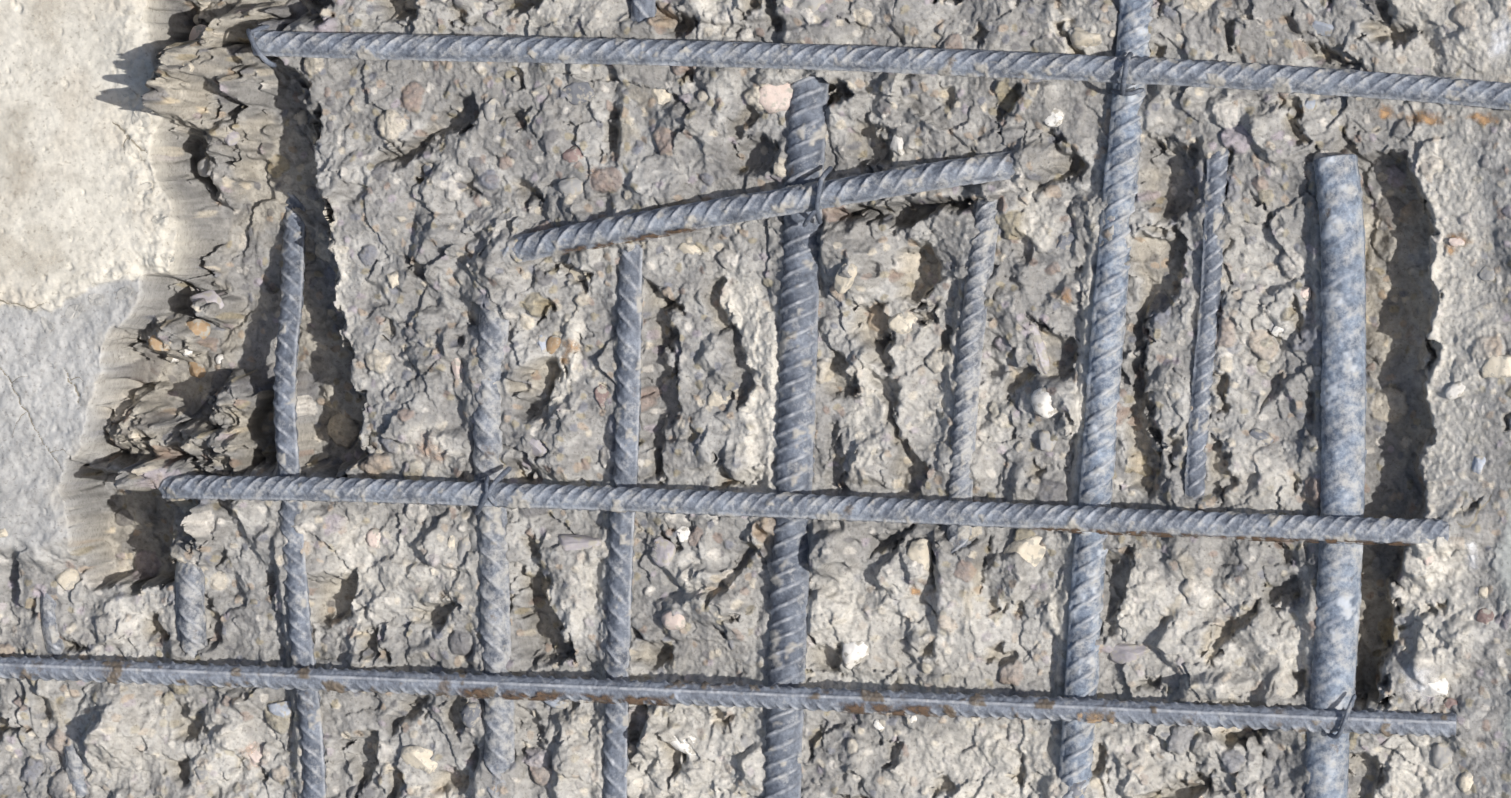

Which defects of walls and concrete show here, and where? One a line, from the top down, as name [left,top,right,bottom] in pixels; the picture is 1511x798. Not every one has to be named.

spalling [74,0,1125,489]
spalling [0,474,1346,798]
spalling [279,57,1449,709]
spalling [1111,0,1511,798]